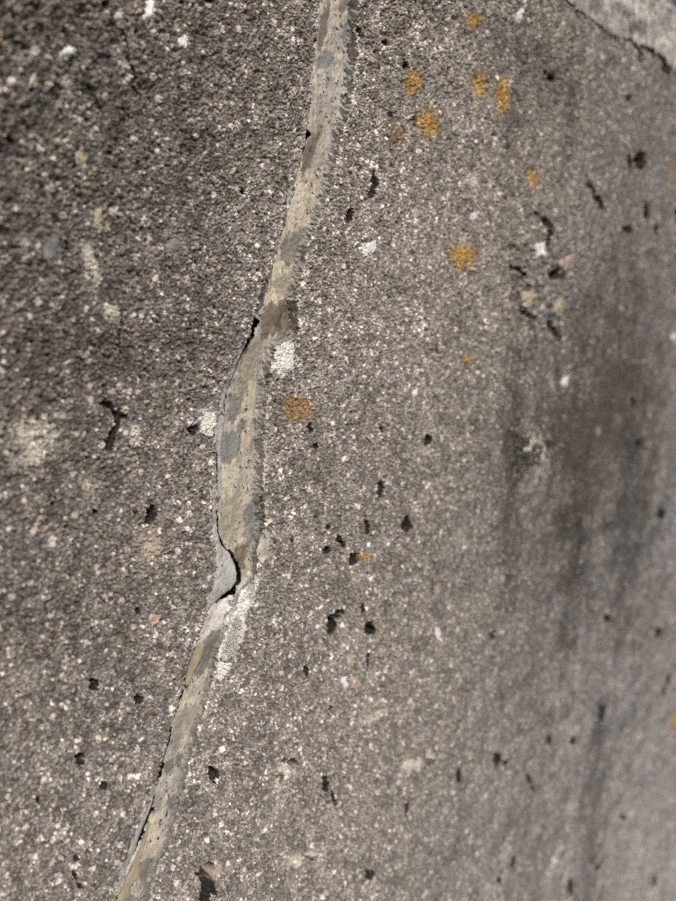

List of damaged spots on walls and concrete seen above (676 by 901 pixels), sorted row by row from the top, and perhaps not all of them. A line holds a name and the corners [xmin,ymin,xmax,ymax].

crack [109,22,141,98]
crack [564,0,671,78]
crack [114,0,360,901]